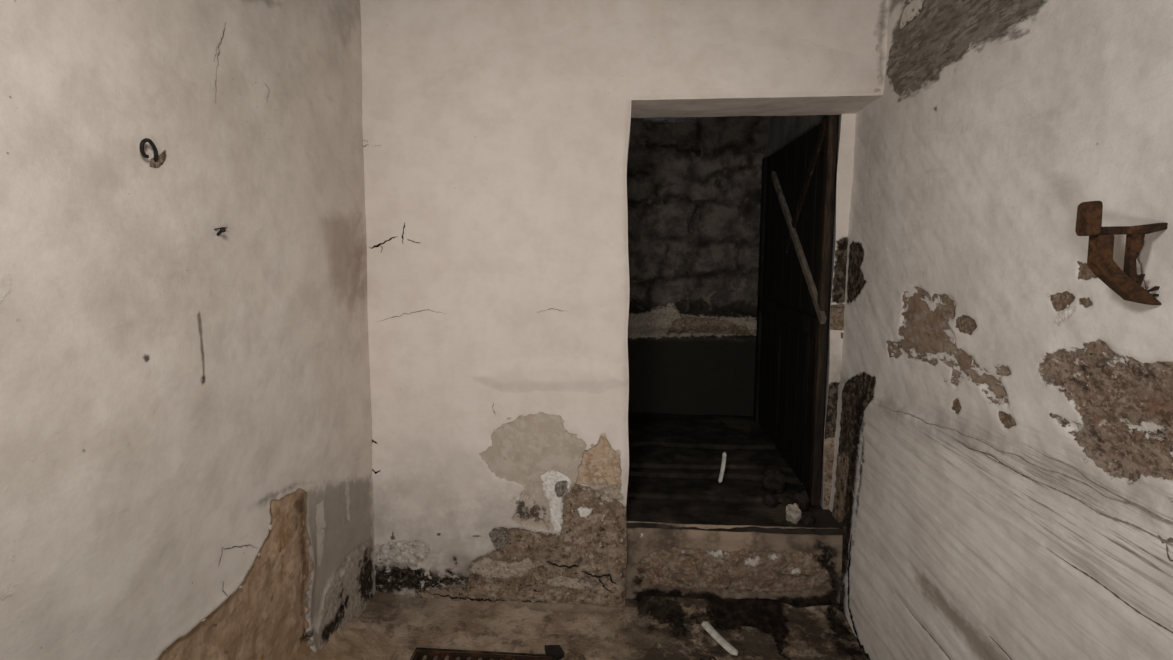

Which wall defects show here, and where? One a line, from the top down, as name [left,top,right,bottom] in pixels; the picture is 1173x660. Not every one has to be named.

peeling [887,0,1045,102]
flaking render [158,488,315,660]
peeling [479,412,622,532]
leakage [301,469,863,660]
flaking render [634,372,876,614]
flaking render [886,286,1016,429]
flaking render [1046,291,1092,311]
flaking render [1077,261,1097,280]
flaking render [1039,340,1173,484]
rust [1136,274,1160,297]